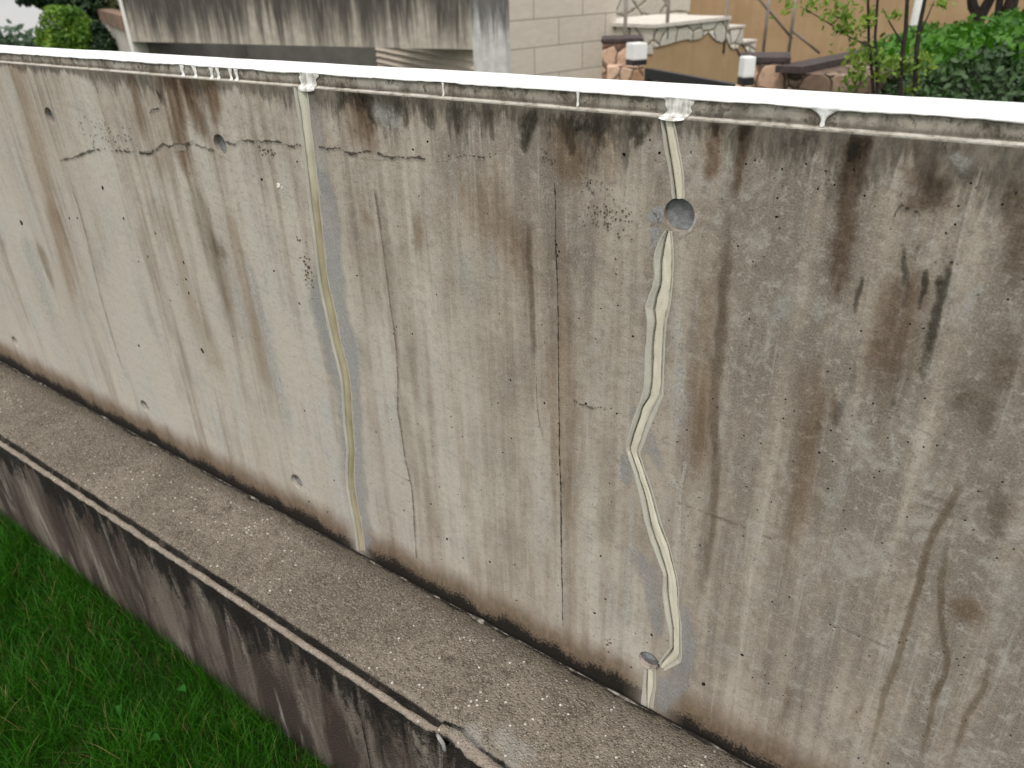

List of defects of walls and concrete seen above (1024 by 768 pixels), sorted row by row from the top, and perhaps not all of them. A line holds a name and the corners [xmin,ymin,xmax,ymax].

crack [61,87,491,559]
crack [536,183,605,620]
crack [625,231,682,709]
crack [660,117,685,199]